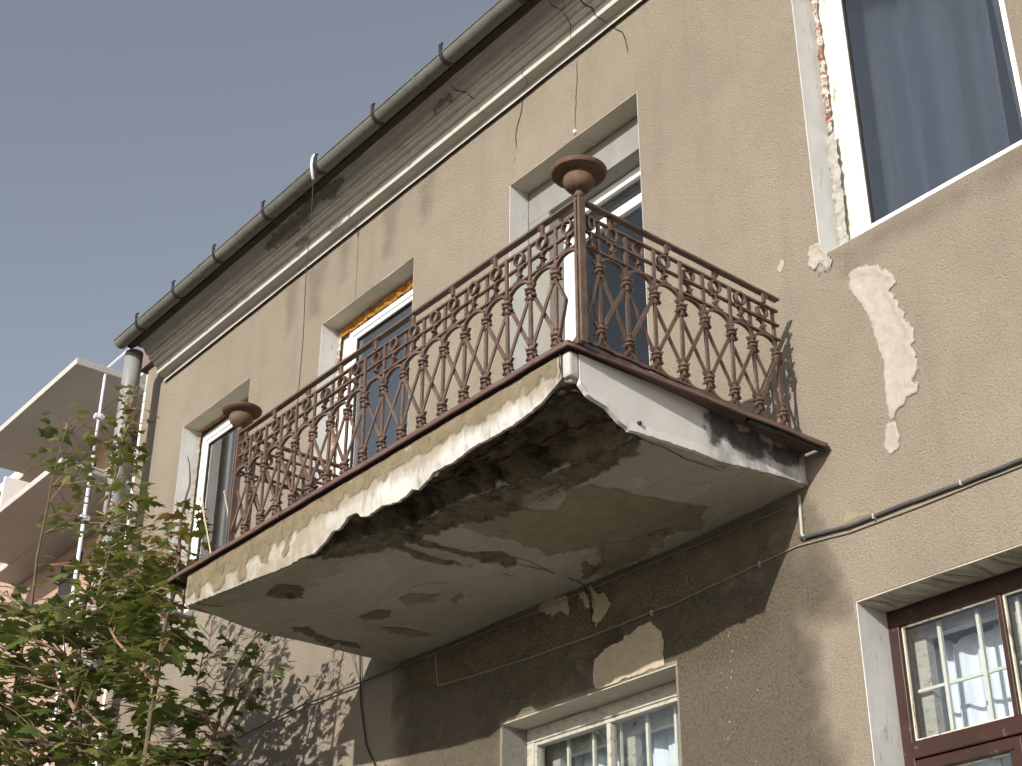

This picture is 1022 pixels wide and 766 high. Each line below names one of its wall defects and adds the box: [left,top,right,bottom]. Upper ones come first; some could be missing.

crack [549,0,628,52]
flaking render [811,0,832,133]
peeling [265,178,344,251]
spalling [808,242,832,278]
flaking render [329,337,341,482]
peeling [884,421,900,454]
spalling [307,389,707,560]
spalling [289,626,360,648]
spalling [359,610,432,637]
peeling [538,585,611,627]
flaking render [593,622,665,689]